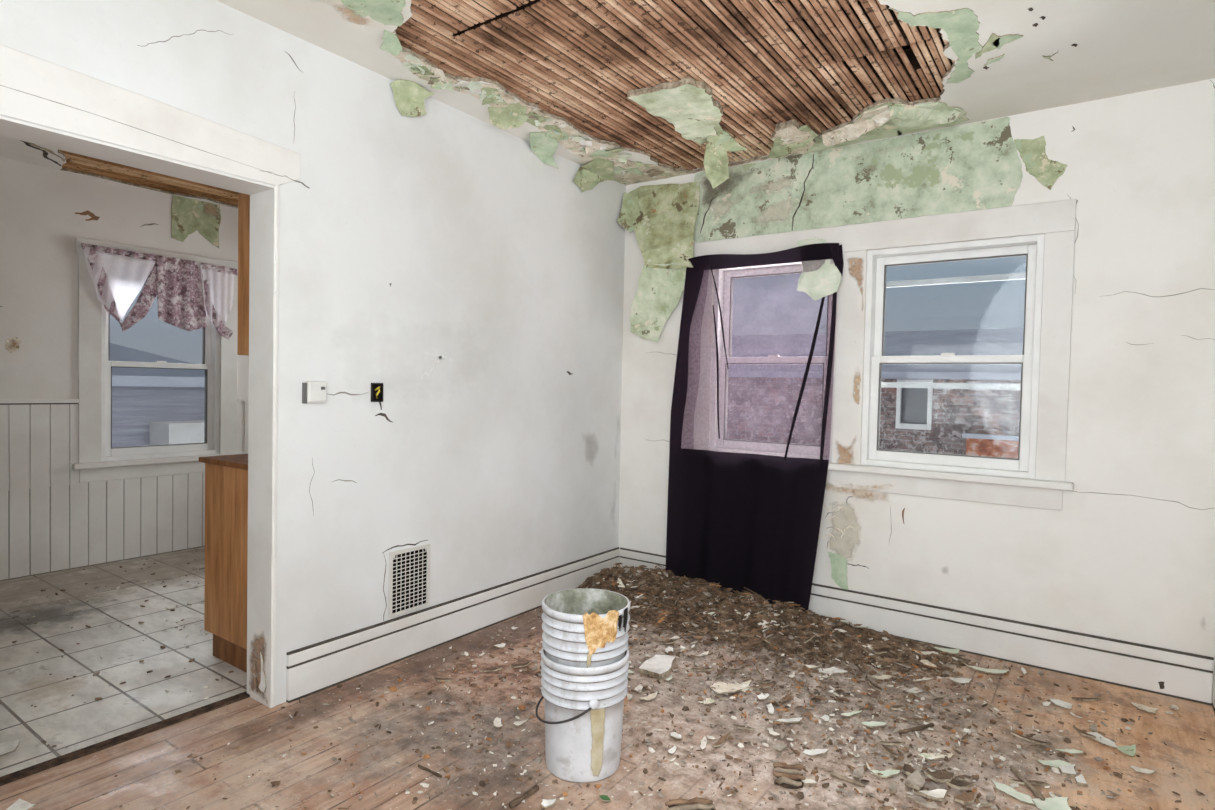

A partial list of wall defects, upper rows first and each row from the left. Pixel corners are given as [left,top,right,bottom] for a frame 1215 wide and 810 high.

crack [138,30,233,47]
peeling [341,0,1068,343]
crack [1073,275,1215,297]
crack [1074,491,1213,510]
peeling [828,552,869,590]